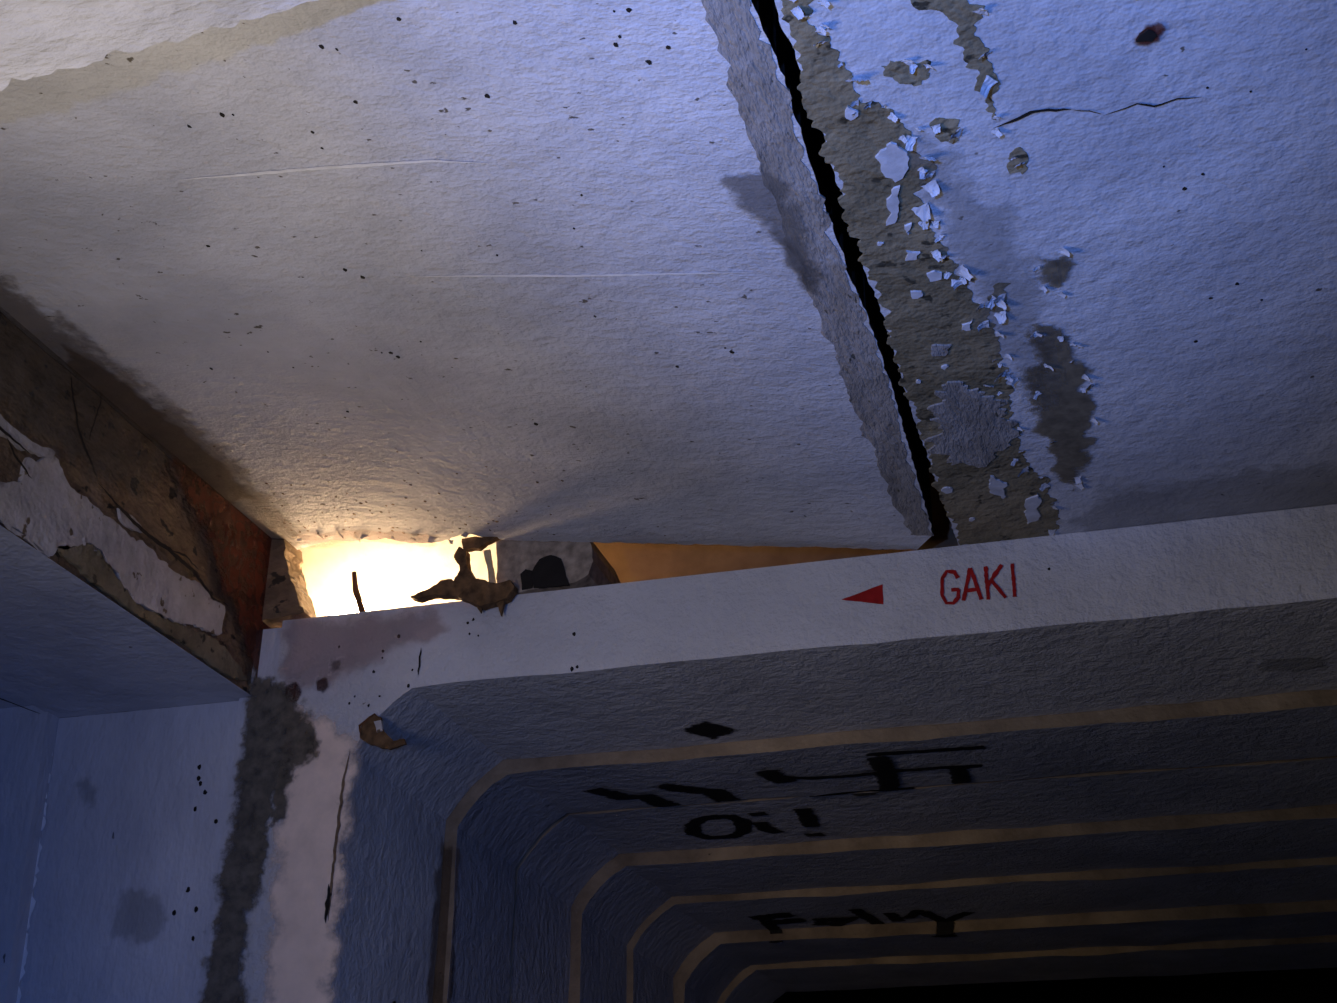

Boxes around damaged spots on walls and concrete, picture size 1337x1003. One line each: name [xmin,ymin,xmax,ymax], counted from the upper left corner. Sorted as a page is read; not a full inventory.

crack [995,97,1200,128]
peeling [593,0,1098,583]
peeling [0,414,248,681]
water stain [200,676,318,1003]